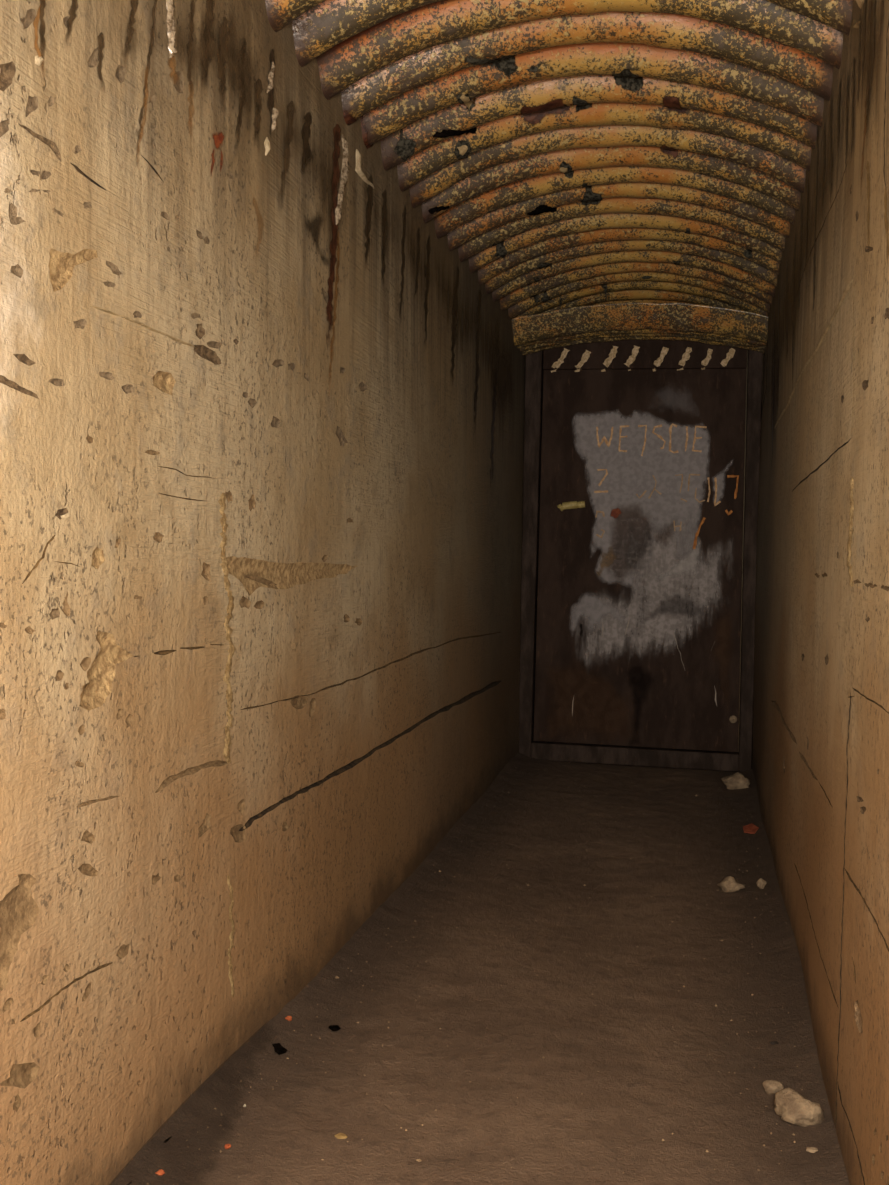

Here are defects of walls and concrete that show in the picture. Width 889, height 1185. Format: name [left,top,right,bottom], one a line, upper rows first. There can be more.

water stain [67,0,78,37]
water stain [125,0,138,54]
water stain [137,0,157,144]
water stain [169,0,275,137]
corrosion [520,96,592,125]
corrosion [663,96,687,113]
corrosion [661,145,678,158]
water stain [282,101,341,338]
crack [239,680,501,831]
spalling [77,864,98,877]
spalling [116,944,130,959]
crack [794,688,889,1185]